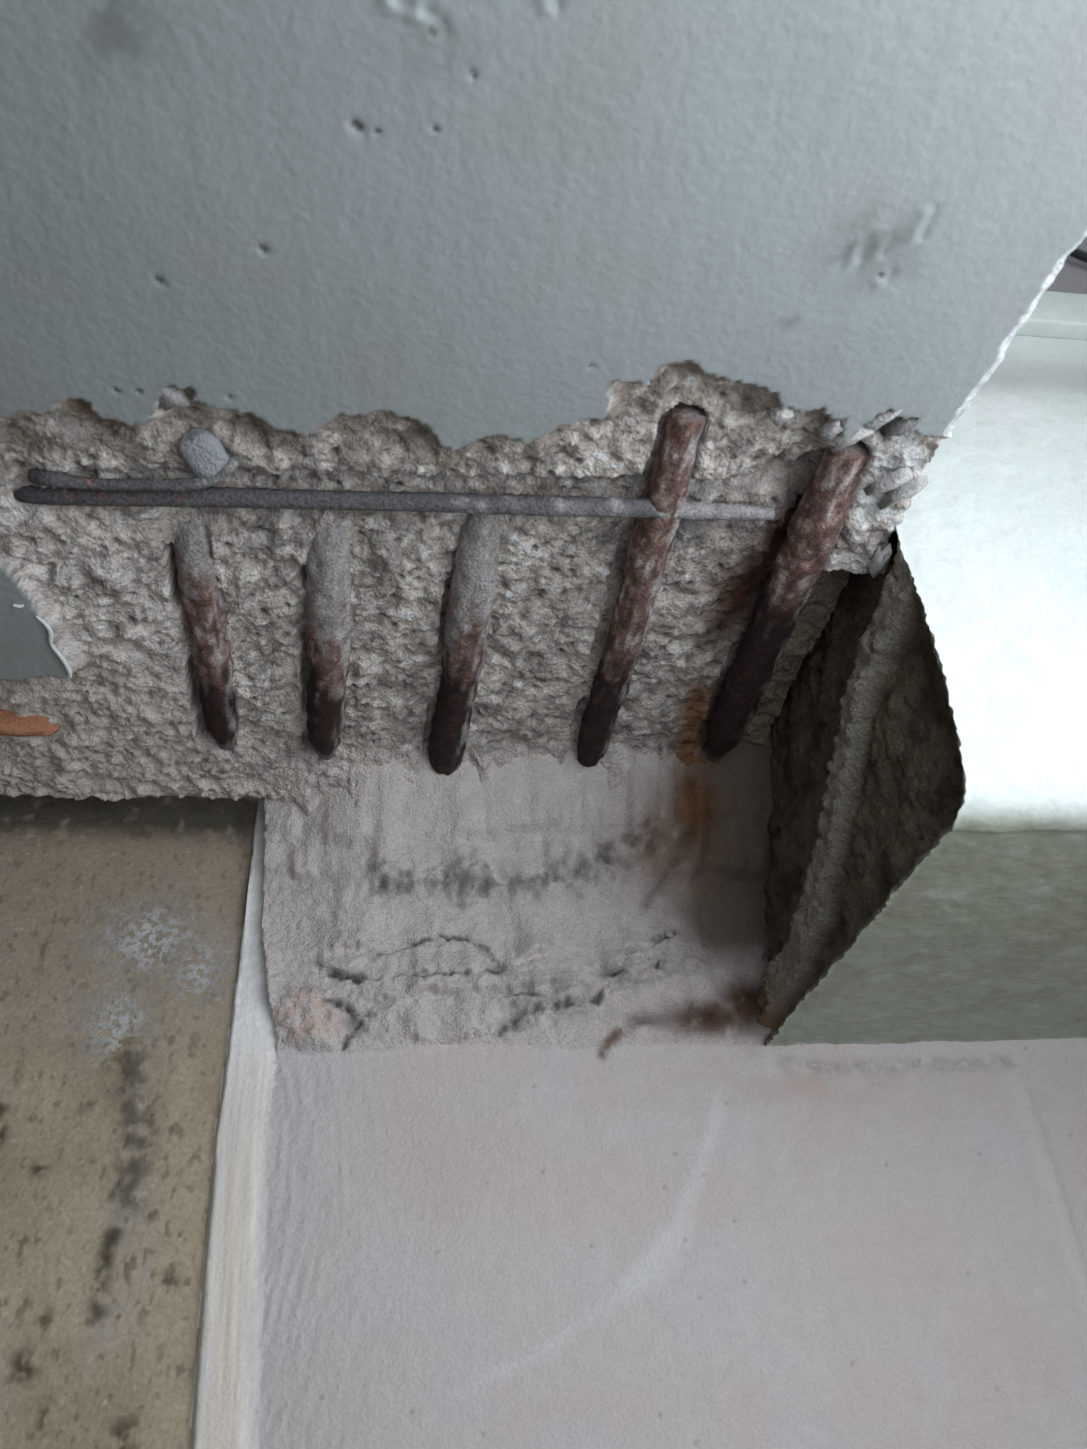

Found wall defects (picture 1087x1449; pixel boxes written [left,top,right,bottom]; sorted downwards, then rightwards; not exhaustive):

rust [721,511,794,624]
spalling [0,234,1087,1054]
rust [677,689,710,837]
efflorescence [105,909,222,995]
water stain [92,998,143,1078]
crack [320,954,380,1050]
rust [600,1030,622,1056]
rust [675,985,761,1031]
water stain [121,1100,144,1204]
water stain [102,1229,120,1268]